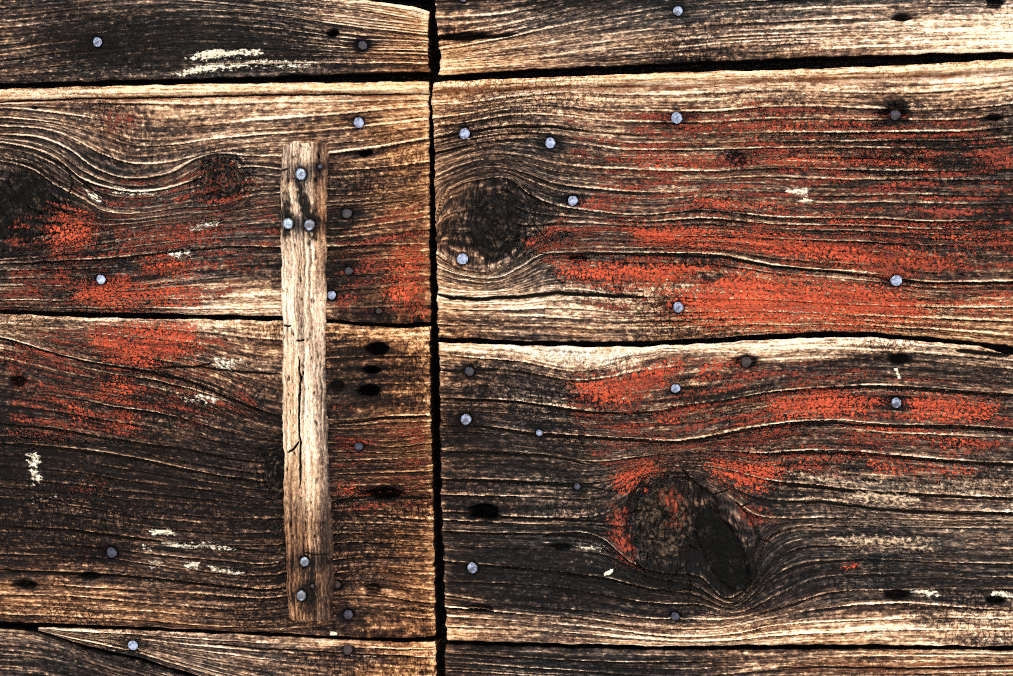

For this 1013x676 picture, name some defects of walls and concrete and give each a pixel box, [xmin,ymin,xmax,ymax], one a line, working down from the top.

peeling [0,160,281,440]
peeling [334,203,431,323]
peeling [522,99,1013,336]
peeling [26,452,43,486]
crack [0,324,304,489]
peeling [331,417,430,514]